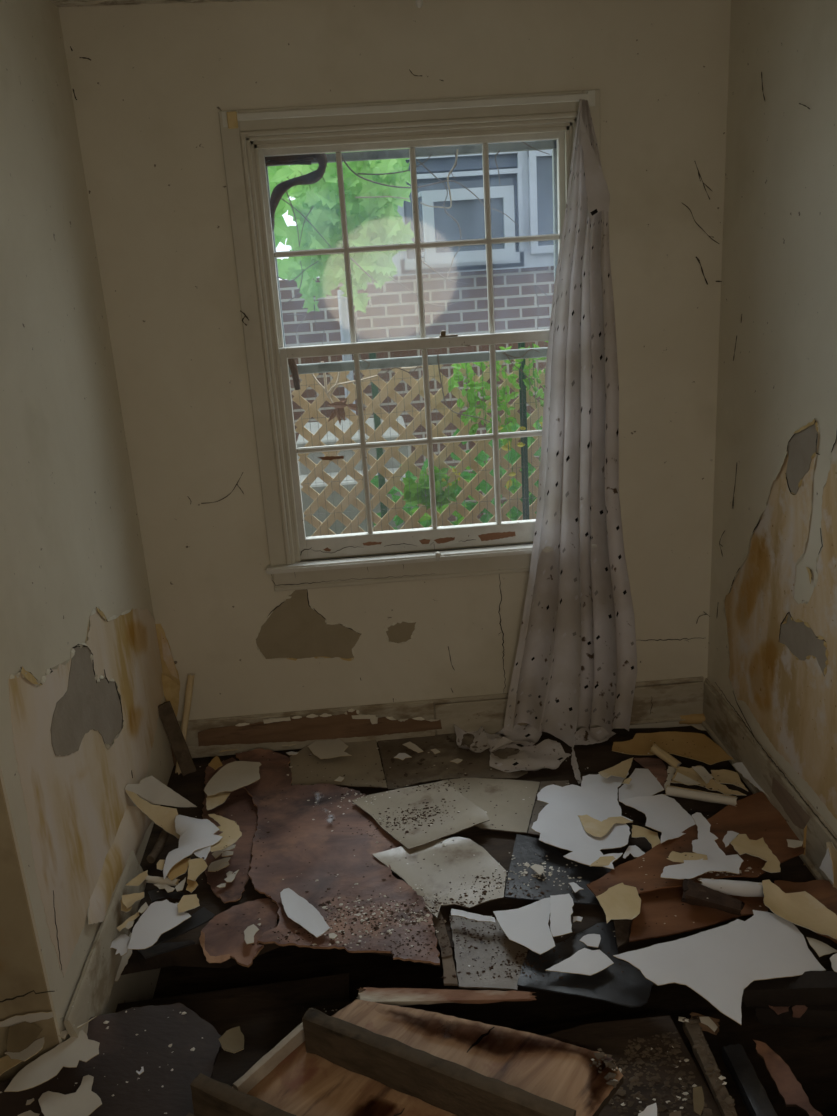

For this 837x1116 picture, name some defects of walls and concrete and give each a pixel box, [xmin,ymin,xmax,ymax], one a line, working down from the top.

peeling [9,606,462,978]
spalling [255,589,361,661]
peeling [724,419,837,819]